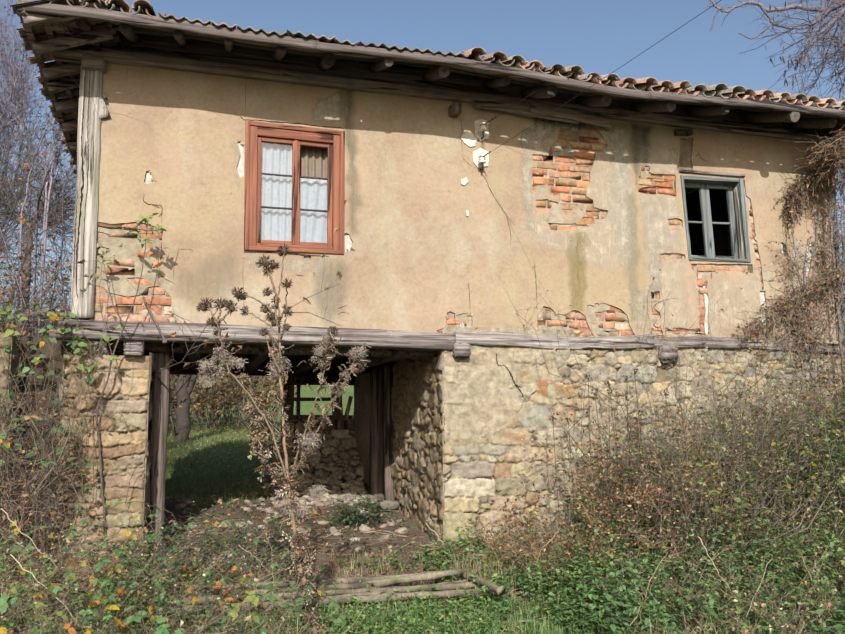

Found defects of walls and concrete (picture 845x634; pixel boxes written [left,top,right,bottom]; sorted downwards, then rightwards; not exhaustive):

spalling [532,128,607,232]
spalling [638,138,696,197]
crack [98,197,163,240]
spalling [93,220,174,323]
spalling [651,203,768,339]
spalling [436,312,474,333]
spalling [535,301,634,337]